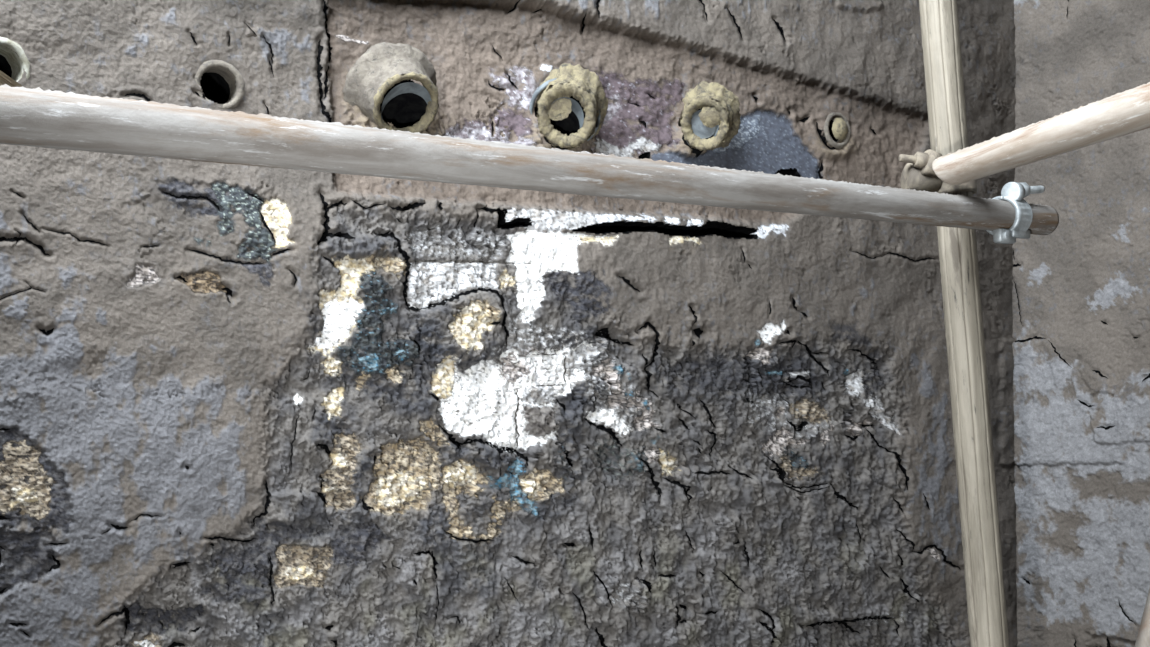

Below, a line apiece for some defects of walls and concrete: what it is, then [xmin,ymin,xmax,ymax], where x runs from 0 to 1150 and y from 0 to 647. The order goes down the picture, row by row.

spalling [651,110,820,179]
crack [0,191,108,256]
spalling [261,198,295,249]
crack [431,394,529,466]
spalling [307,208,703,540]
spalling [746,321,786,364]
crack [769,297,878,402]
spalling [760,369,900,480]
spalling [0,440,55,591]
crack [556,322,900,647]
crack [845,424,961,602]
crack [394,532,534,625]